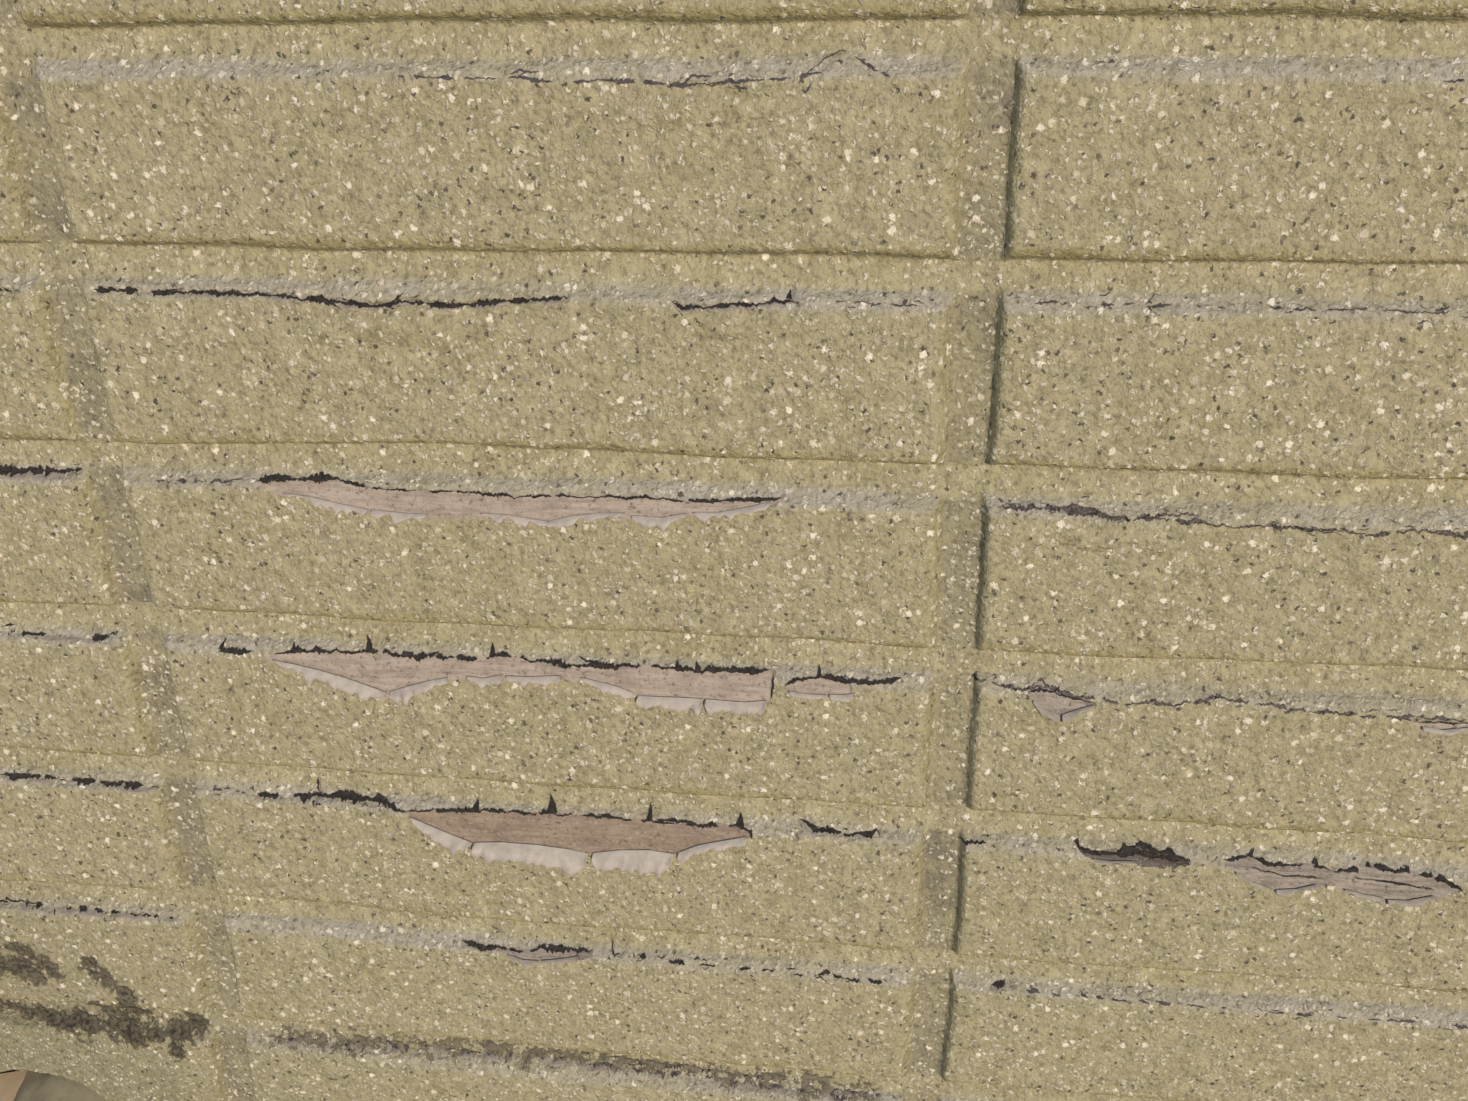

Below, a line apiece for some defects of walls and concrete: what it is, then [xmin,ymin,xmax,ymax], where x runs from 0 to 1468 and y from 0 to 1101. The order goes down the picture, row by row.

crack [398,49,890,93]
crack [92,286,568,312]
crack [0,462,82,482]
peeling [257,471,782,532]
crack [999,496,1468,541]
peeling [218,635,902,716]
peeling [1028,684,1096,723]
crack [971,671,1466,726]
crack [0,770,157,794]
peeling [387,795,753,877]
peeling [1074,839,1191,869]
peeling [1224,848,1463,907]